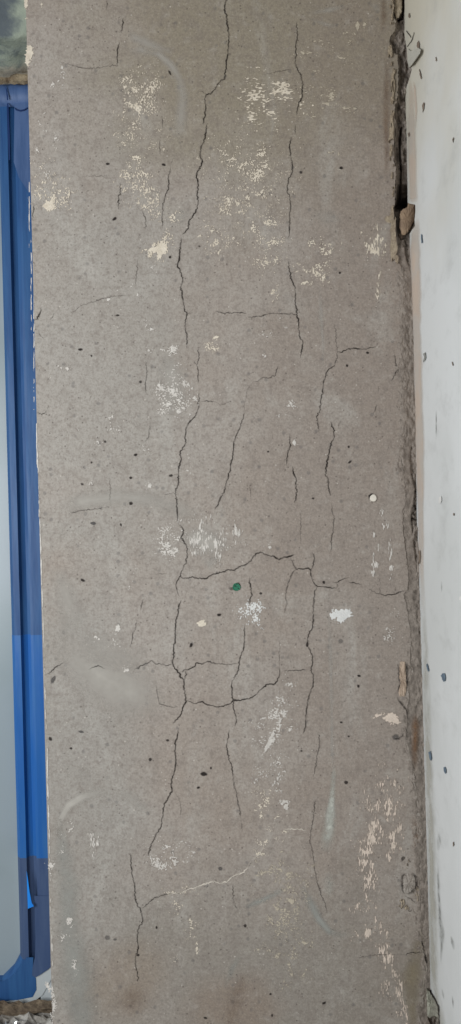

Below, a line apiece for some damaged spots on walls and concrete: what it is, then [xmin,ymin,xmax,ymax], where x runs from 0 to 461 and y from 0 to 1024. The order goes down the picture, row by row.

spalling [361,45,404,264]
peeling [408,41,422,78]
crack [130,5,372,981]